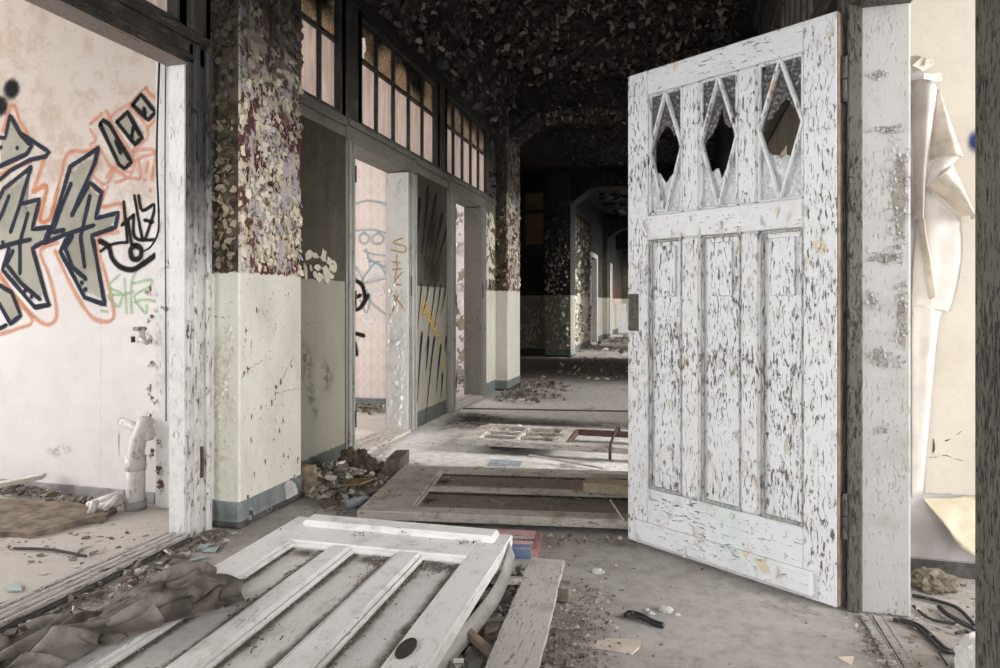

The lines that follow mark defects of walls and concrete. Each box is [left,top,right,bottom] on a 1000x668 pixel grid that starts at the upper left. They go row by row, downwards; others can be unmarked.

peeling [210,0,337,284]
peeling [366,0,748,292]
flaking render [866,68,975,563]